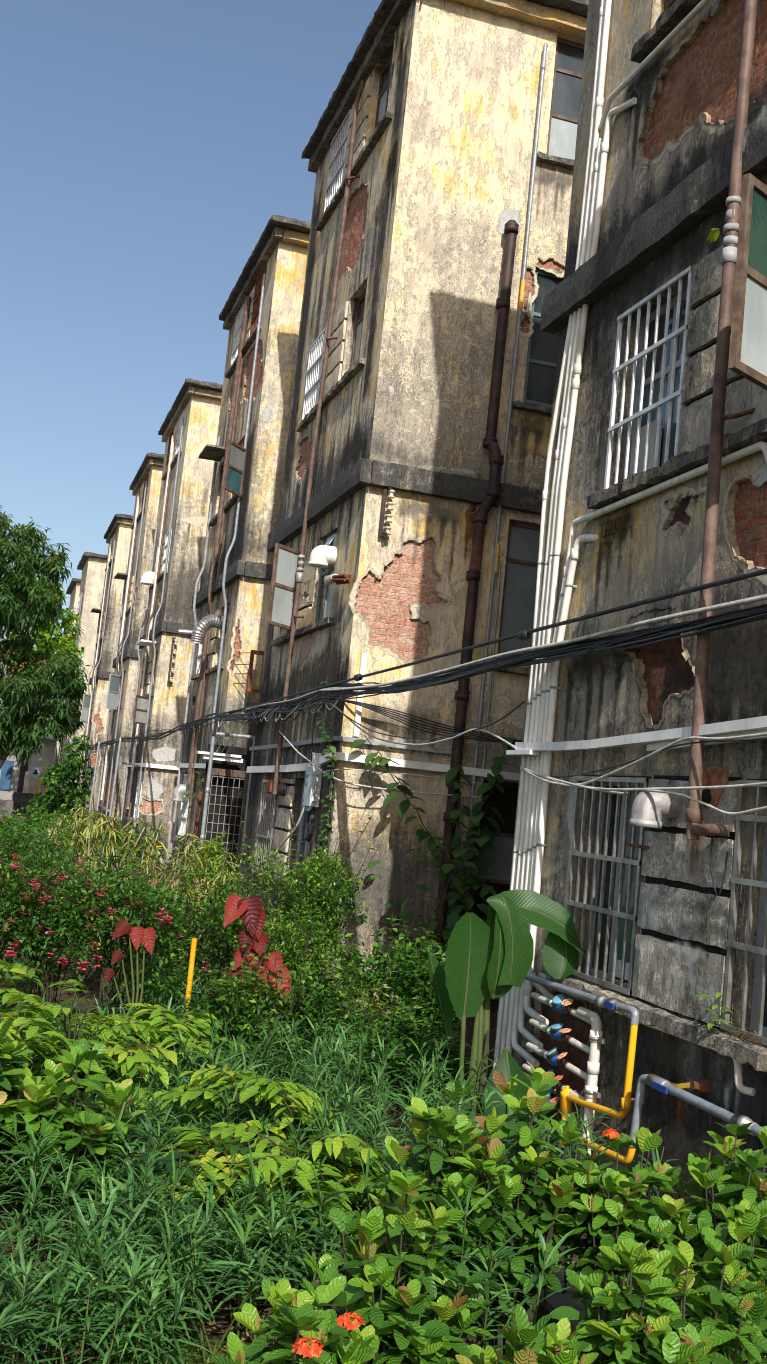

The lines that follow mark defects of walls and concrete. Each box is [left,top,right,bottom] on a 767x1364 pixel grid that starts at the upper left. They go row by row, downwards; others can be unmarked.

flaking render [635,0,767,169]
flaking render [333,179,370,284]
water stain [362,16,412,406]
flaking render [516,255,565,338]
flaking render [659,483,707,537]
flaking render [721,461,767,585]
water stain [169,563,199,623]
flaking render [349,519,452,667]
water stain [364,710,438,756]
water stain [564,646,626,761]
flaking render [624,621,695,731]
water stain [667,944,701,979]